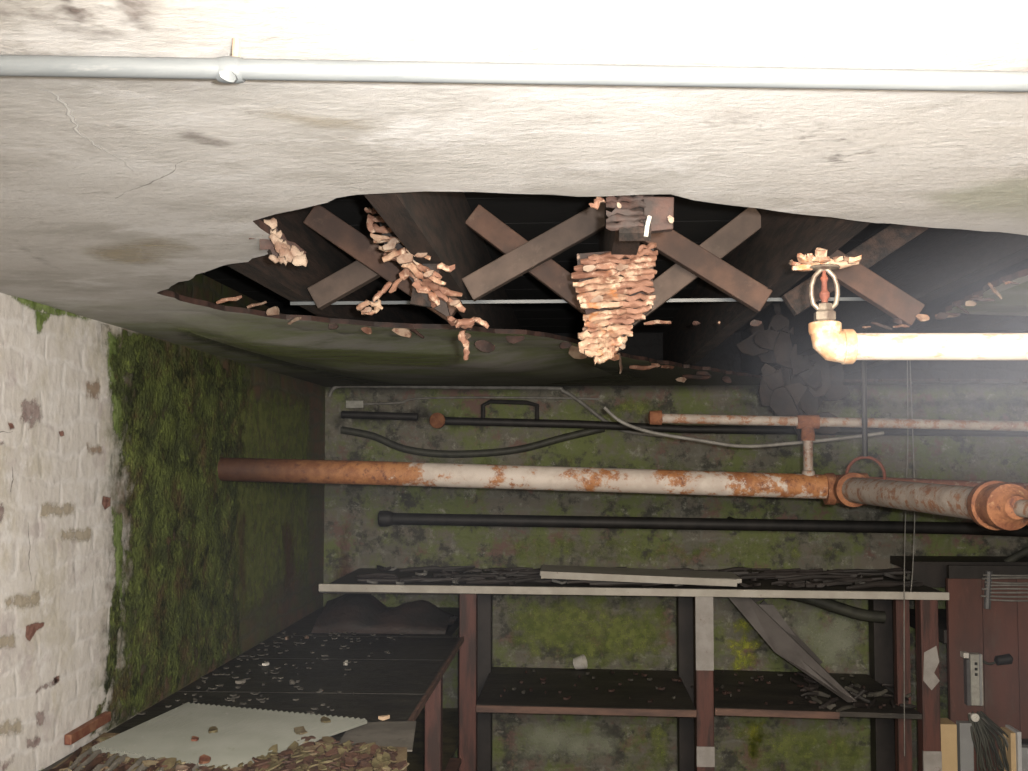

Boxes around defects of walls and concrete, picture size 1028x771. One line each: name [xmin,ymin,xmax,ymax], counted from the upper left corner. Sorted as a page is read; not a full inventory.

peeling [249,218,308,267]
peeling [383,238,428,264]
spalling [216,295,302,325]
spalling [862,280,1020,330]
damp [188,334,431,385]
spalling [392,328,424,339]
spalling [559,342,588,359]
spalling [610,342,732,383]
damp [794,614,858,665]